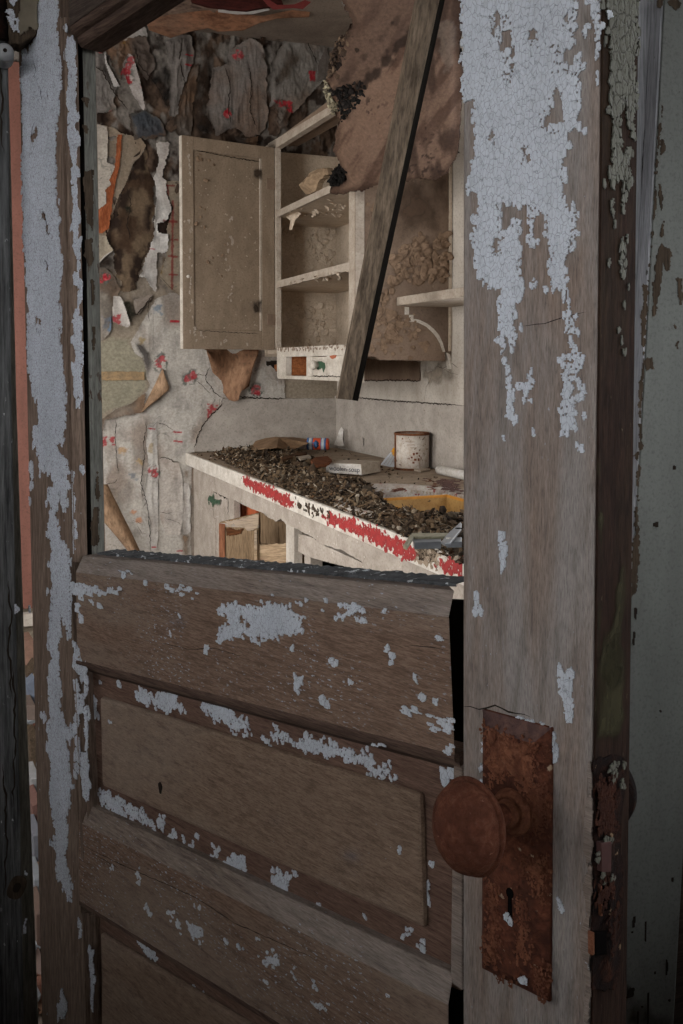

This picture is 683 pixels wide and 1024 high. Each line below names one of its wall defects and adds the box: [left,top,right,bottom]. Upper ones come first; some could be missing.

leakage [150,66,170,107]
peeling [458,0,641,453]
peeling [5,0,247,903]
crack [108,417,180,550]
peeling [203,594,309,655]
peeling [321,598,367,624]
peeling [293,672,304,695]
peeling [200,702,398,782]
peeling [400,672,455,787]
peeling [270,866,298,891]
peeling [77,917,96,1013]
peeling [400,926,426,954]